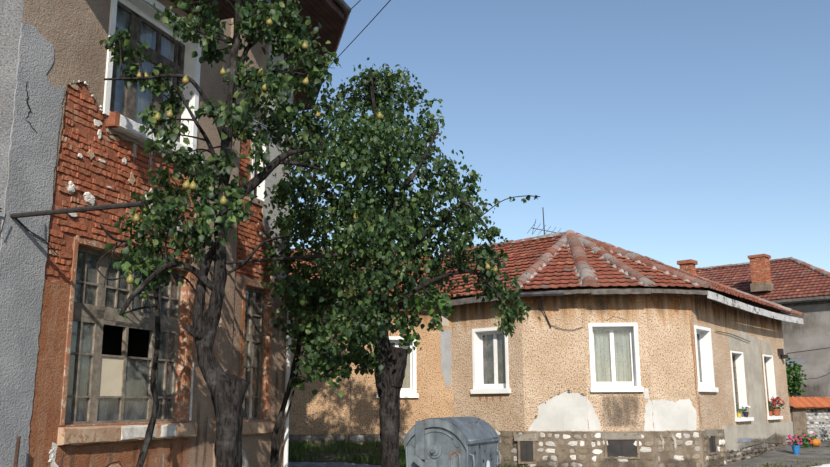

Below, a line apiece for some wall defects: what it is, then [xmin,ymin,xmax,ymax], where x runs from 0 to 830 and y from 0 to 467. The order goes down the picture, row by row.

crack [25,80,36,131]
flaking render [45,80,194,284]
flaking render [235,133,273,283]
spalling [48,442,58,467]